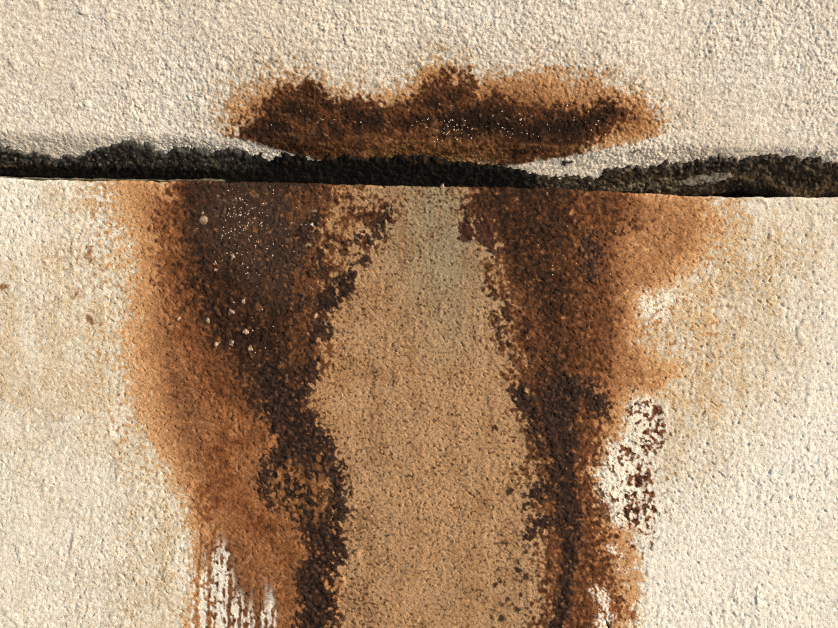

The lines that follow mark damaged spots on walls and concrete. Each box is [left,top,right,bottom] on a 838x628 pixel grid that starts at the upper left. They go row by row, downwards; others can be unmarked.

corrosion [210,46,670,166]
corrosion [82,180,753,628]
peeling [595,392,665,553]